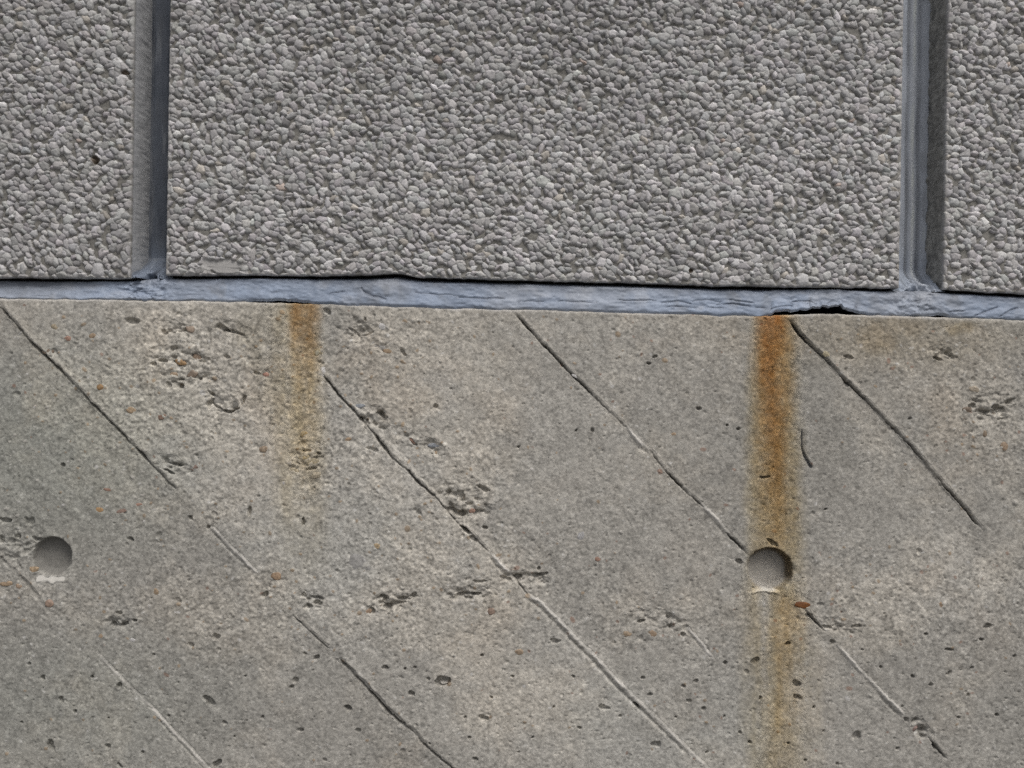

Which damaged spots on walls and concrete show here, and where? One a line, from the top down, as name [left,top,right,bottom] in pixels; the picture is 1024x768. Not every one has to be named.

crack [592,394,627,431]
crack [392,456,405,471]
crack [648,450,669,471]
crack [690,493,703,507]
crack [436,498,492,556]
crack [509,570,531,598]